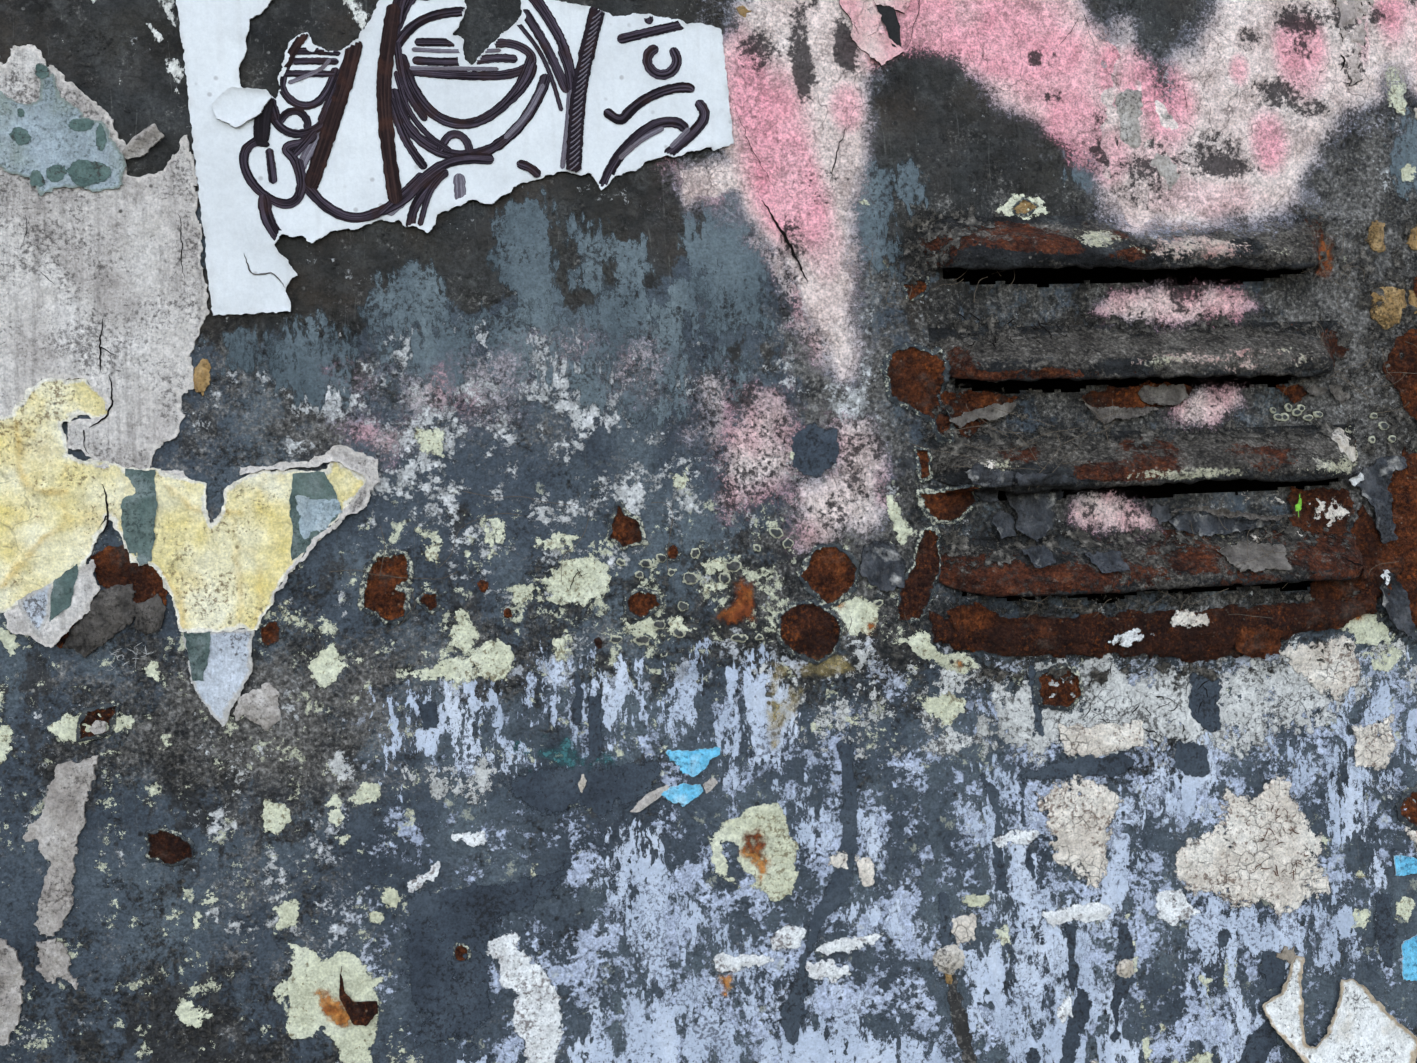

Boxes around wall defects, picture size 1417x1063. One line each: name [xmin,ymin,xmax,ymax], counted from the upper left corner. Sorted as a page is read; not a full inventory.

rust [879,329,1417,711]
peeling [62,583,167,658]
rust [91,545,167,606]
rust [357,549,441,626]
rust [717,580,754,625]
rust [775,541,860,665]
peeling [299,570,1417,1063]
rust [1395,785,1417,831]
rust [742,829,767,880]